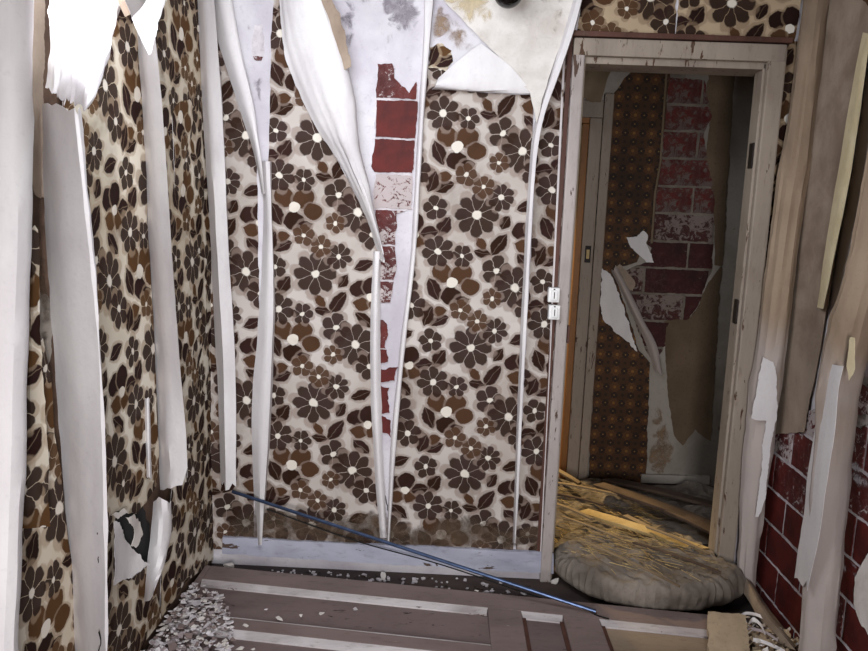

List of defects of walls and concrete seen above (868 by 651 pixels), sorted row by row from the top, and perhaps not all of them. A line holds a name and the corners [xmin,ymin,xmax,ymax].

flaking render [251,24,264,61]
water stain [383,0,417,28]
flaking render [40,294,53,363]
flaking render [380,320,398,437]
flaking render [371,63,418,303]
flaking render [626,74,715,356]
flaking render [756,409,815,646]
flaking render [836,363,868,651]